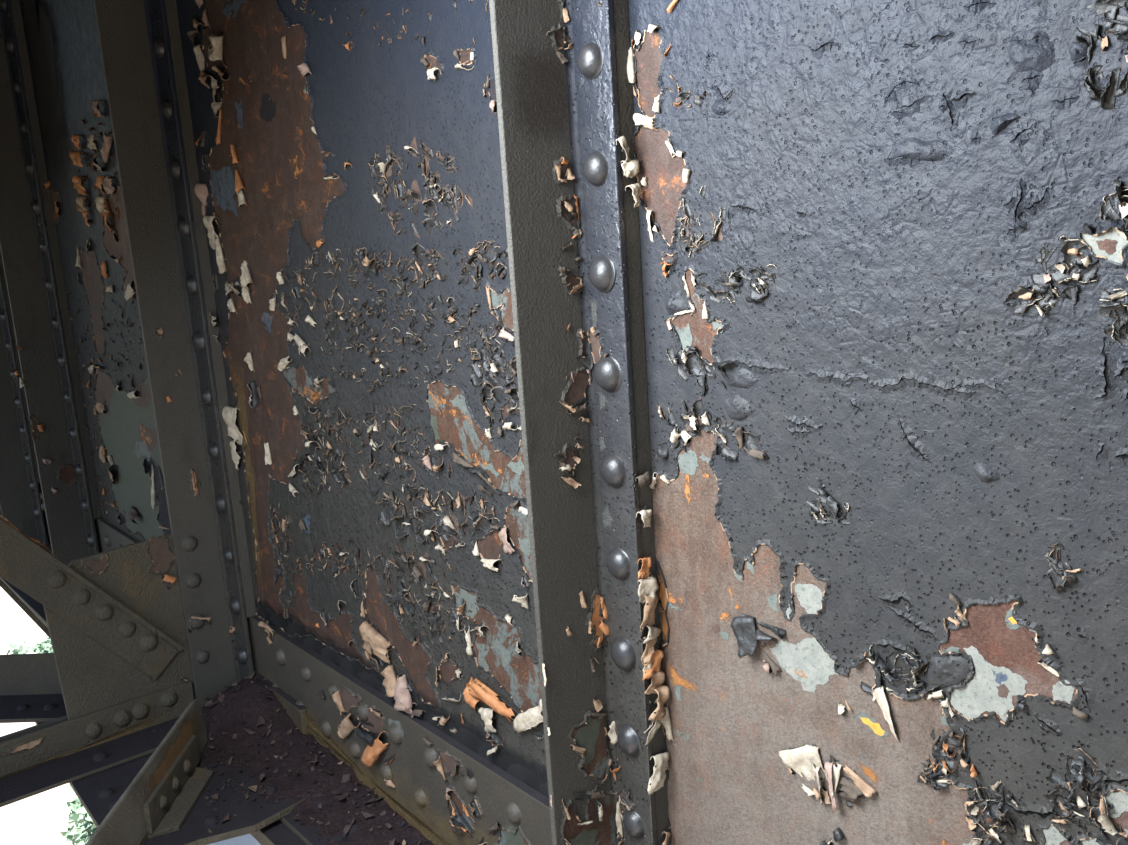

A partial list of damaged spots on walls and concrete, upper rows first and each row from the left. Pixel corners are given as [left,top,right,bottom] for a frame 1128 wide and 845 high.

peeling [1073,0,1128,110]
peeling [42,100,177,590]
peeling [187,0,550,768]
crack [723,355,1009,463]
peeling [616,24,1128,845]
rust [670,667,695,688]
rust [861,765,877,782]